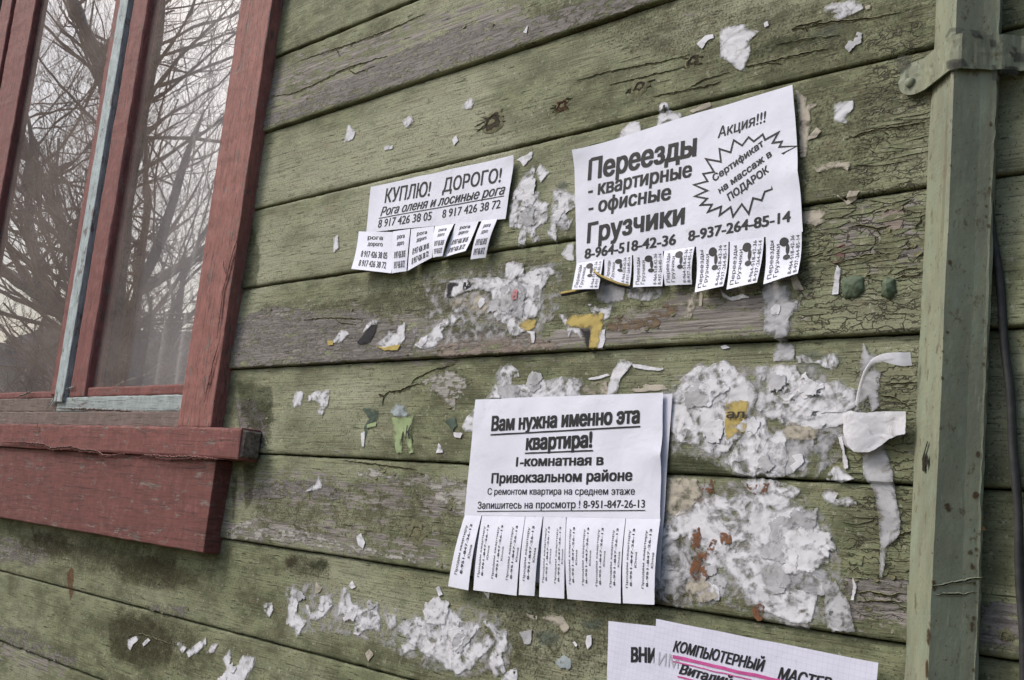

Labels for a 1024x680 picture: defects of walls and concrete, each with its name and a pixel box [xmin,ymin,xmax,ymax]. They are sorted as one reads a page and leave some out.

crack [273,14,423,96]
peeling [263,0,650,127]
crack [804,197,926,281]
crack [378,365,452,406]